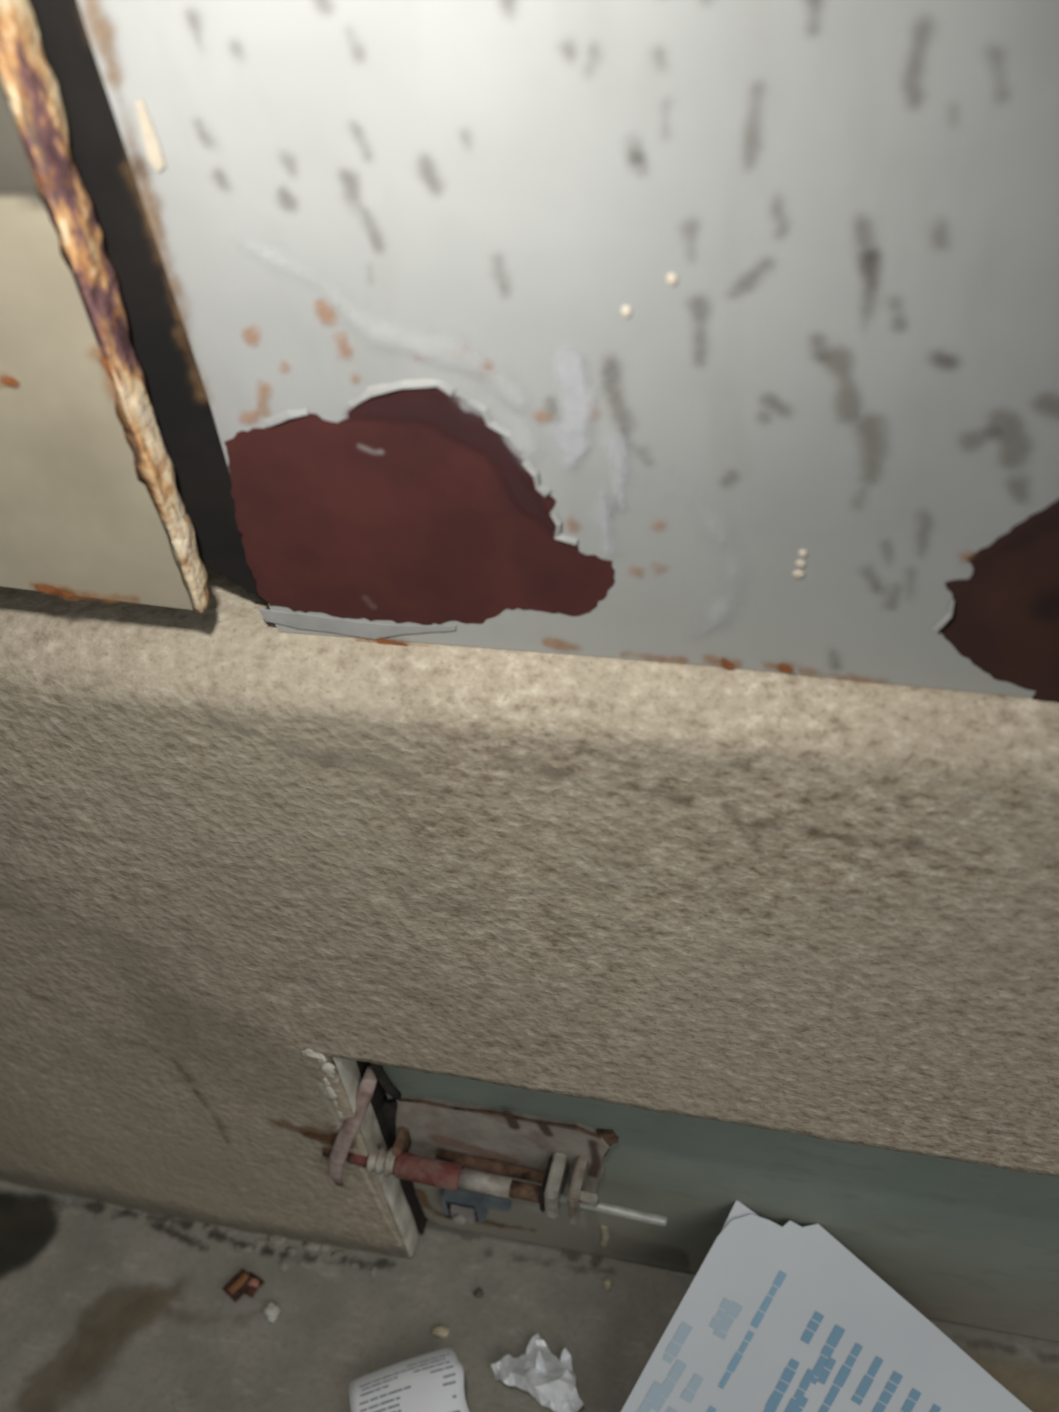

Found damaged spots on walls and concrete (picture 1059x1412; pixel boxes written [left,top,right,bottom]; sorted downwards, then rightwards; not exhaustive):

rust [0,0,210,613]
peeling [224,379,615,625]
water stain [558,352,588,463]
peeling [932,499,1059,703]
water stain [0,1193,57,1277]
rust [273,1121,353,1147]